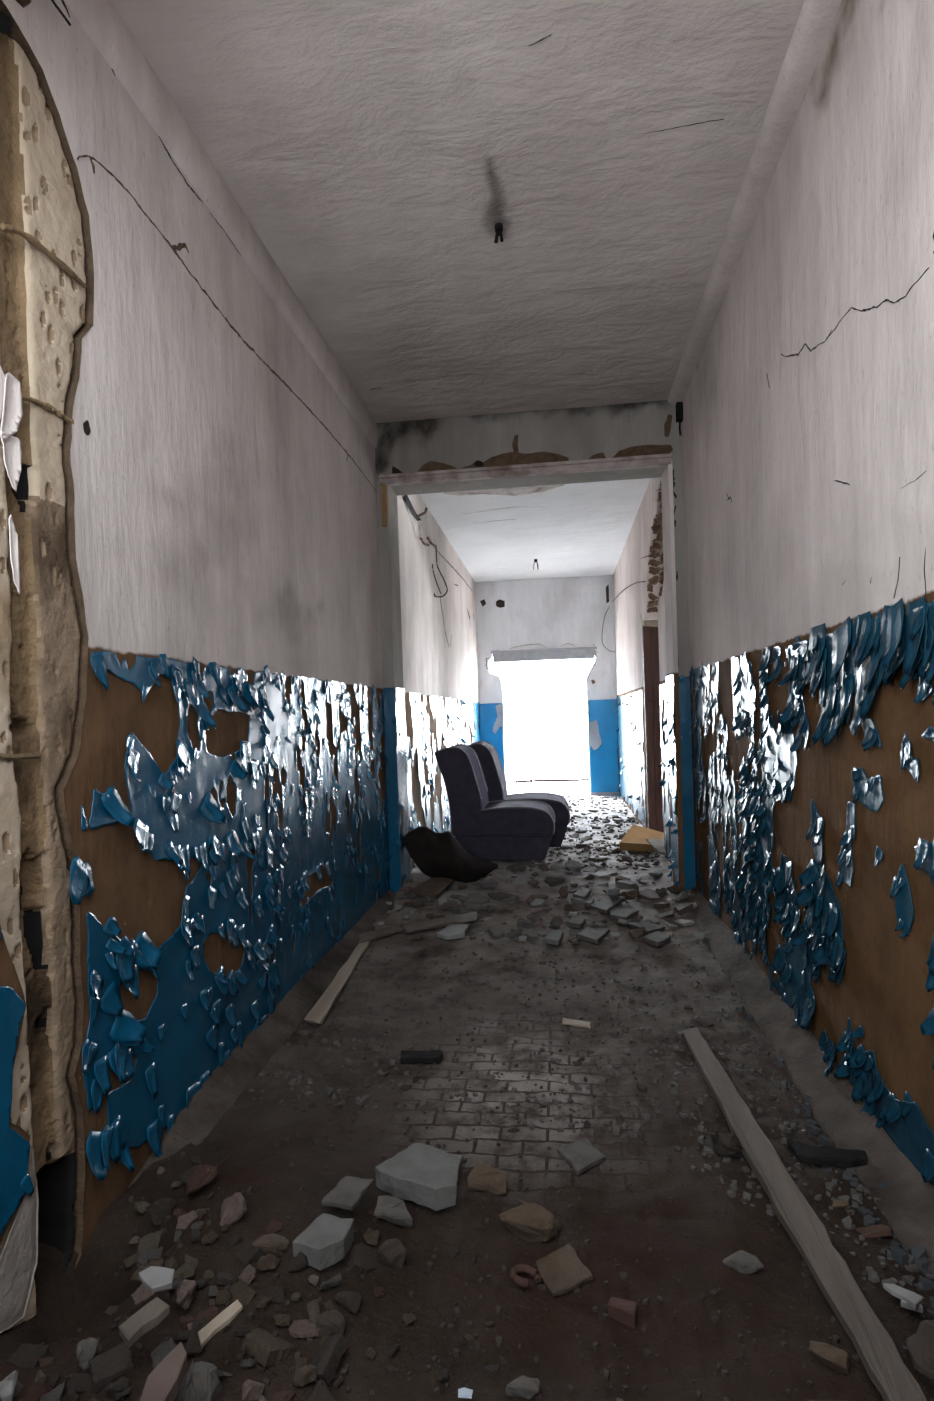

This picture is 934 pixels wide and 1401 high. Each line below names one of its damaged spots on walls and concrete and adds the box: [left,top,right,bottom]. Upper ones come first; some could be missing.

spalling [0,0,504,1333]
spalling [641,484,664,613]
peeling [589,597,934,1185]
crack [767,233,934,389]